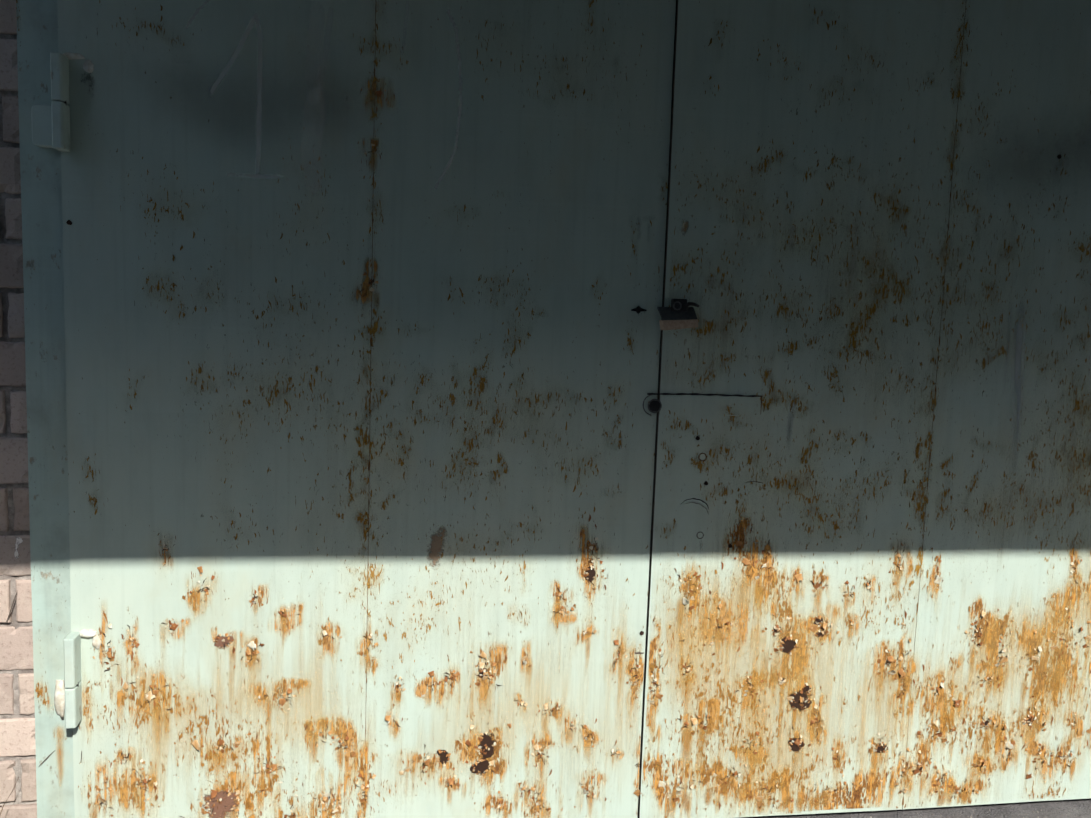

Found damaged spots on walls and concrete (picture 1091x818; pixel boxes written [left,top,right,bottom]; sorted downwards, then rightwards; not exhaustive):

rust [474,0,1091,818]
rust [35,682,54,710]
rust [440,775,463,797]
peeling [199,788,240,818]